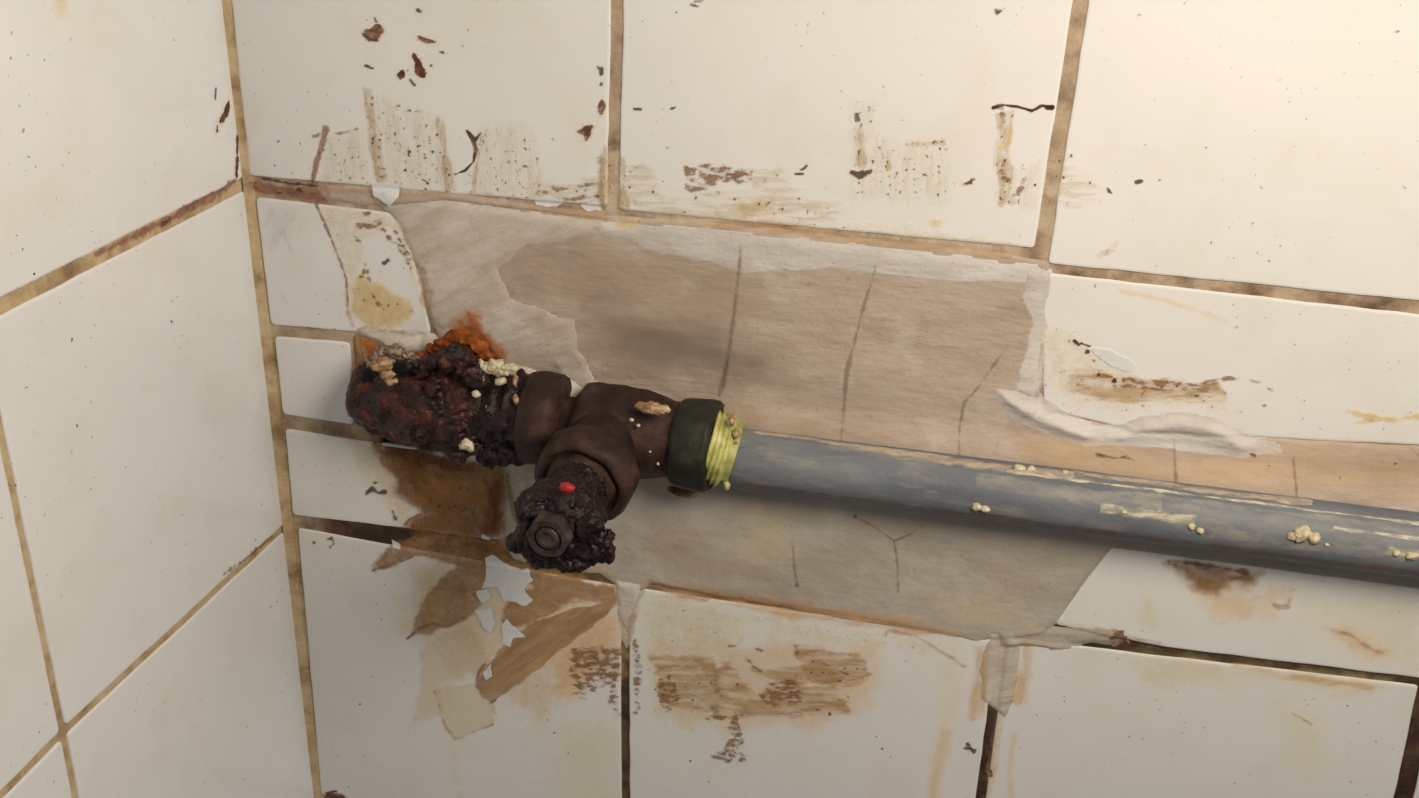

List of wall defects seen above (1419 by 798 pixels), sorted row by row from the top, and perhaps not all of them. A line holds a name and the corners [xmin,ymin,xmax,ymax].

leakage [346,269,432,330]
corrosion [361,338,398,386]
spalling [360,360,414,383]
corrosion [415,312,505,381]
corrosion [366,437,628,704]
peeling [475,535,533,647]
corrosion [667,589,957,636]
corrosion [1174,561,1254,592]
corrosion [658,678,680,712]
corrosion [705,714,746,763]